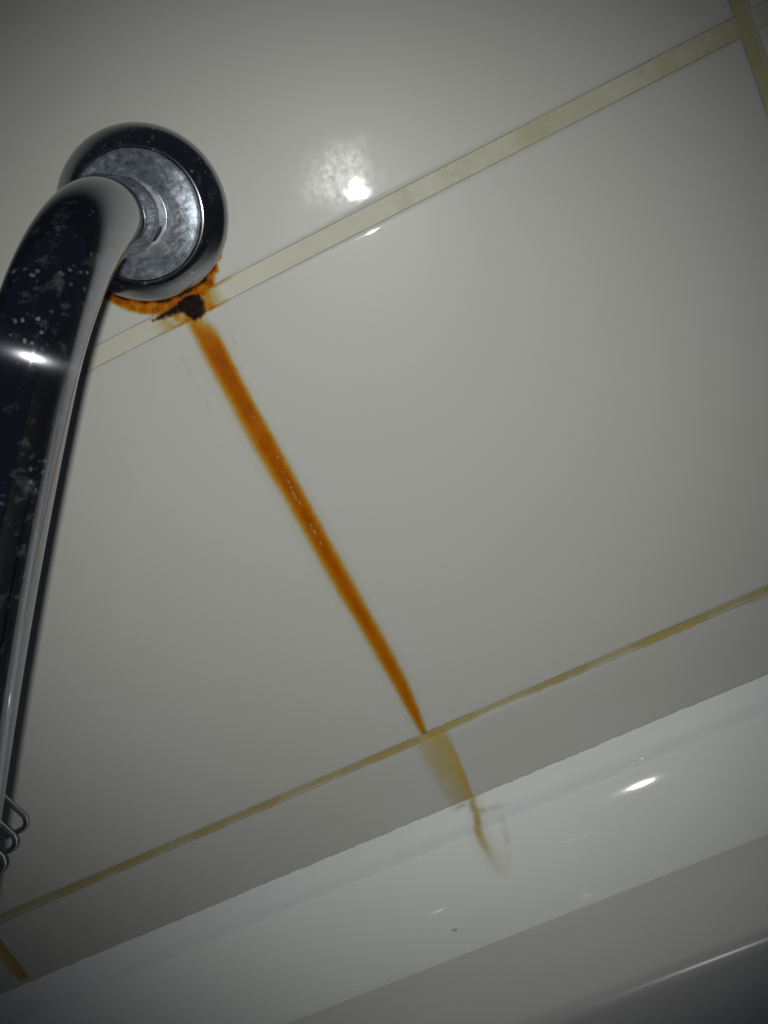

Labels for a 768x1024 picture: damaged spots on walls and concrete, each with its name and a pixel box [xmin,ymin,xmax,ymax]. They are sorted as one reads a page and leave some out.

rust [105,253,485,847]